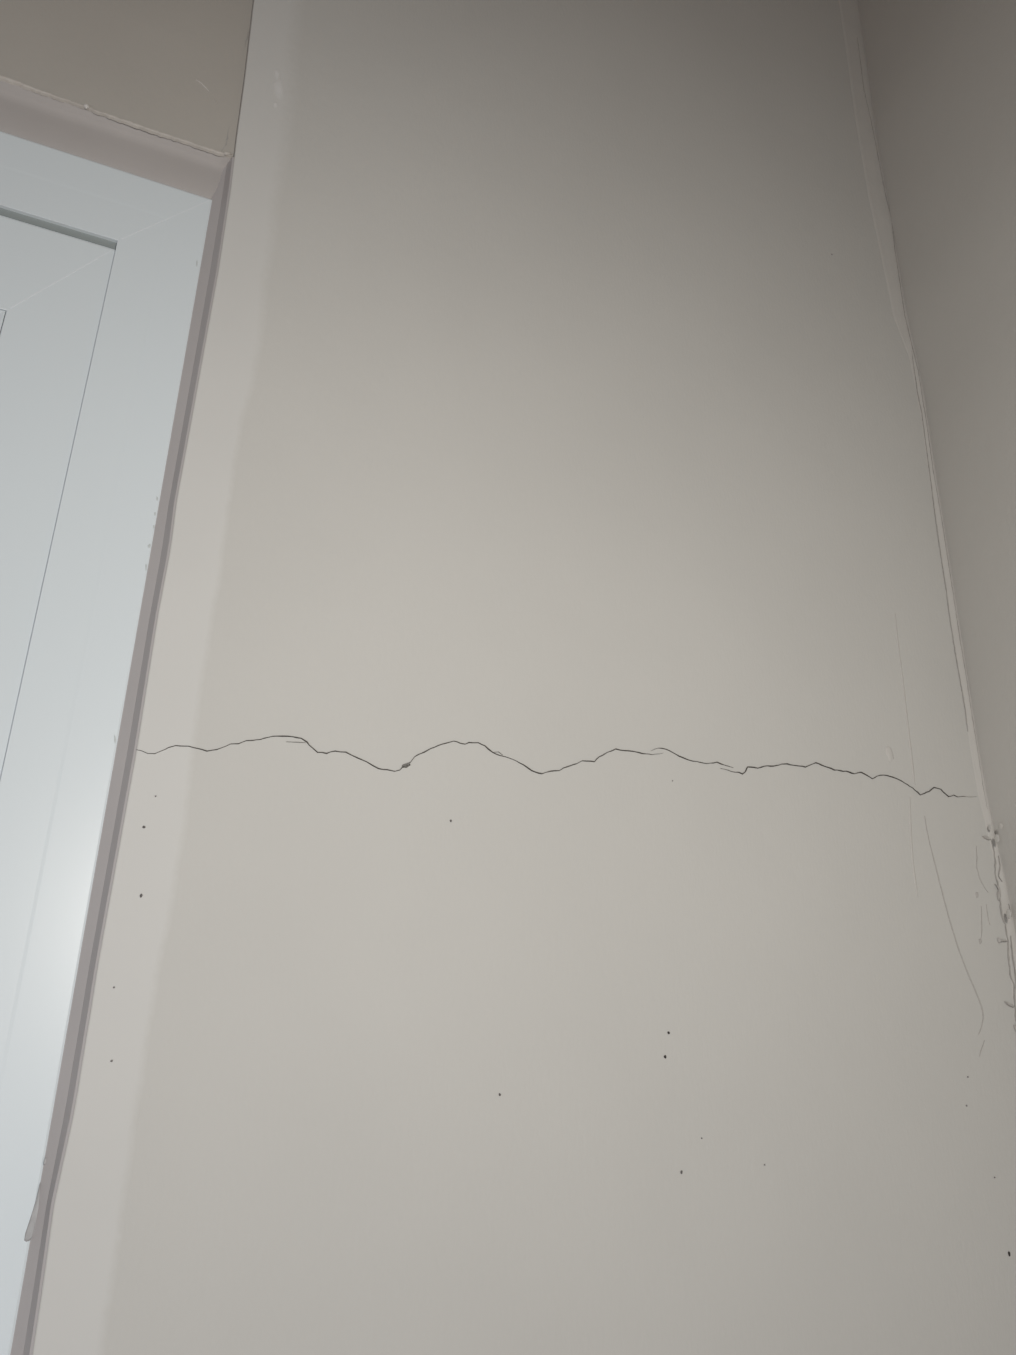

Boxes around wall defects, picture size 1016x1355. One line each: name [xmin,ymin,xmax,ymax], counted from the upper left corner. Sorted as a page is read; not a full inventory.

crack [136,38,990,1057]